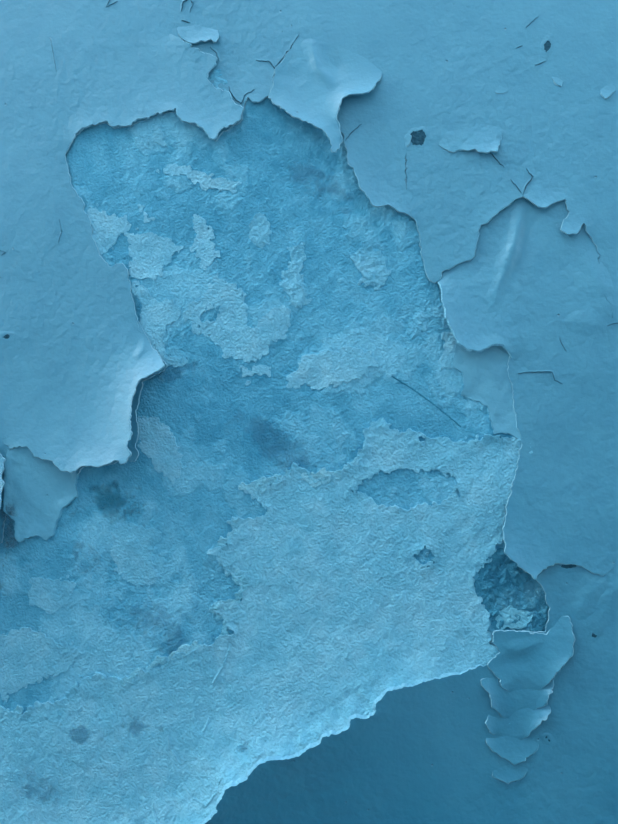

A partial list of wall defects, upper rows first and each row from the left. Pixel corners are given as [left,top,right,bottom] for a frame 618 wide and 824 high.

peeling [63,34,244,147]
crack [228,33,299,104]
peeling [268,38,382,153]
peeling [0,97,614,713]
peeling [0,418,614,824]